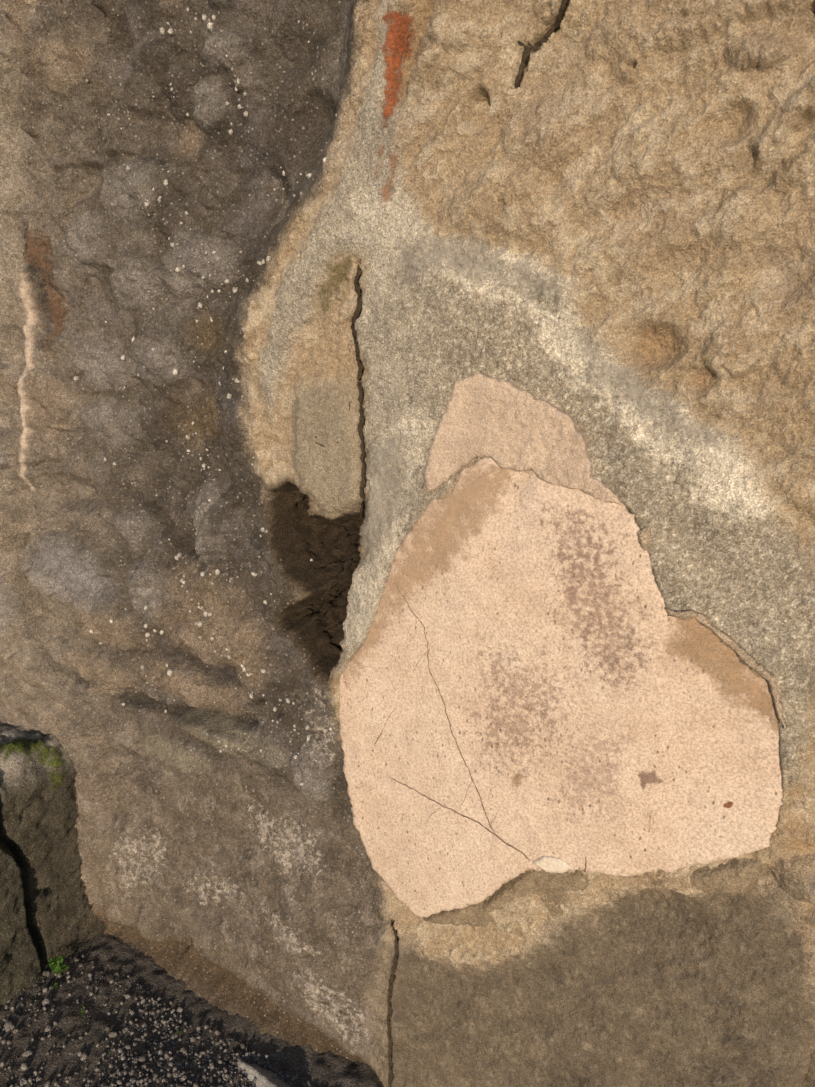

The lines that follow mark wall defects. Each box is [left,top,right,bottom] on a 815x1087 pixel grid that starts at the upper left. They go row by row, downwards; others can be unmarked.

crack [515,0,567,83]
crack [315,265,365,521]
spalling [257,0,815,789]
crack [389,585,529,860]
crack [387,922,403,1087]